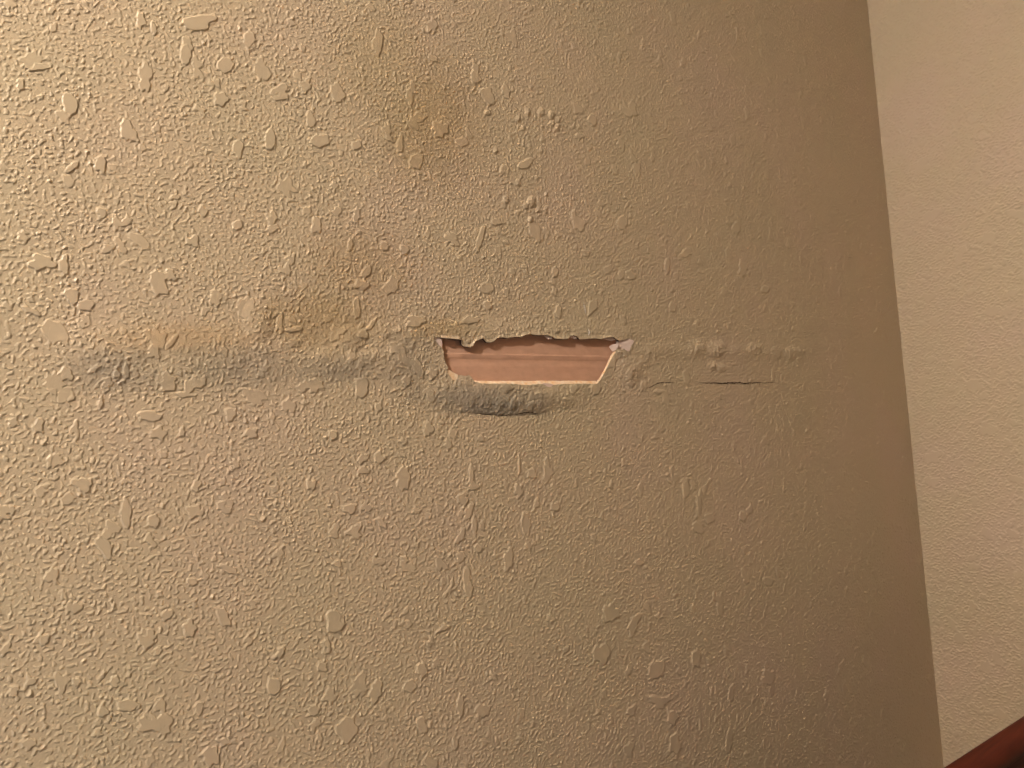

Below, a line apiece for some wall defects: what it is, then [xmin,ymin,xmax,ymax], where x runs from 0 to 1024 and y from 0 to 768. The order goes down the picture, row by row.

spalling [434,331,634,387]
crack [716,379,773,387]